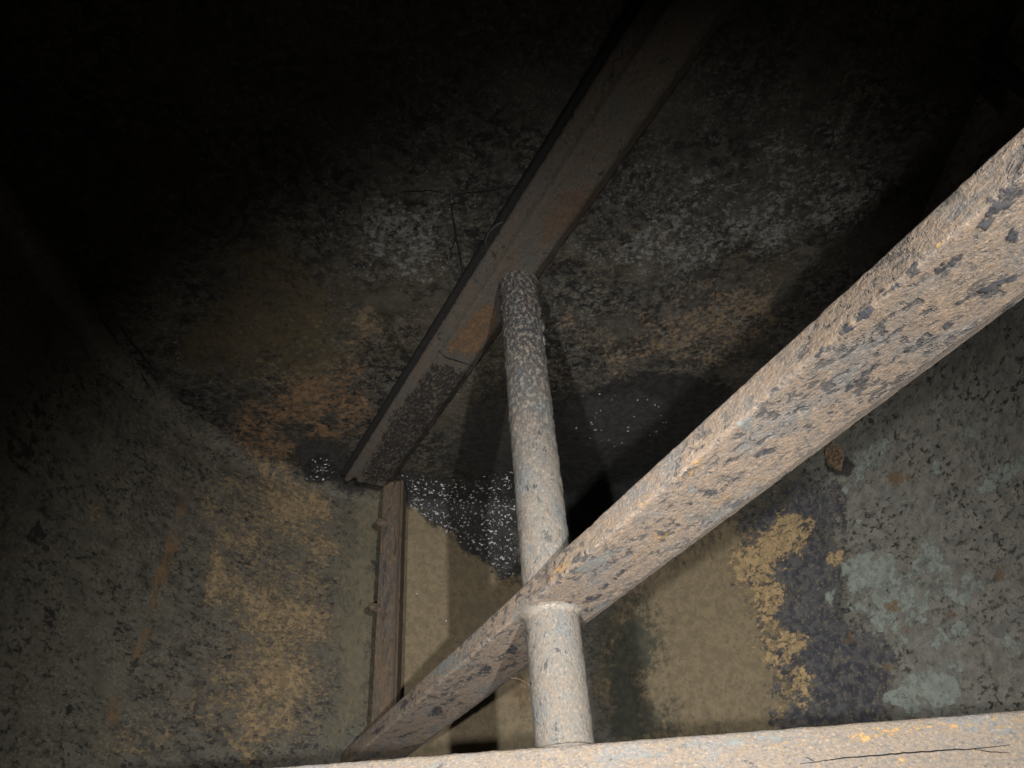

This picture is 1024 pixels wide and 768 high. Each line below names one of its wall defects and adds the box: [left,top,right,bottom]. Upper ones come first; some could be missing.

rust [164,279,388,764]
rust [401,504,522,699]
rust [407,666,535,757]
crack [801,745,1007,764]